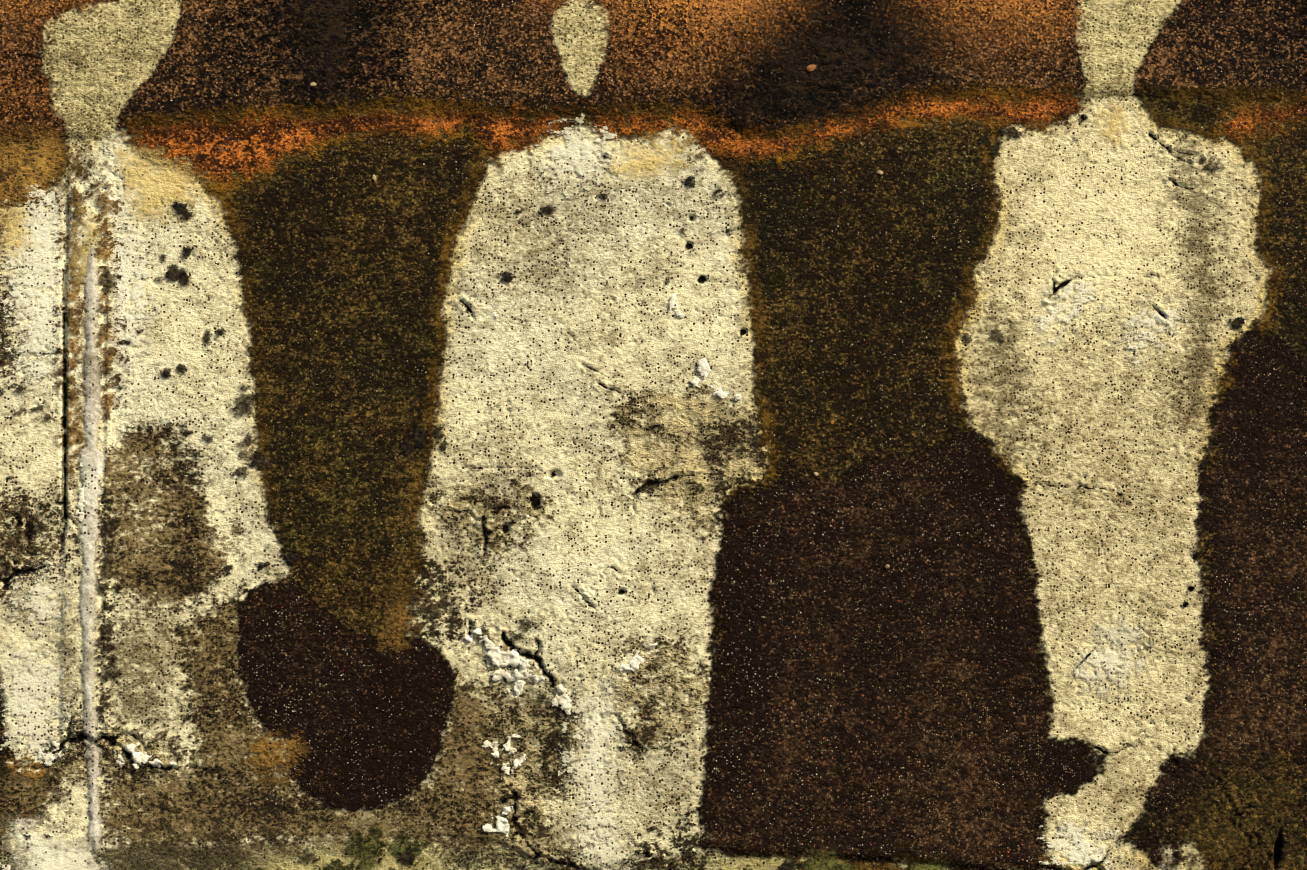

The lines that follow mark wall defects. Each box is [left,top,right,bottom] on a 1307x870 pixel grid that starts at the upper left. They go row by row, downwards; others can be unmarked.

rust [1211,82,1307,147]
crack [468,623,555,687]
spalling [464,626,585,870]
crack [1048,836,1127,870]
crack [1218,782,1282,870]